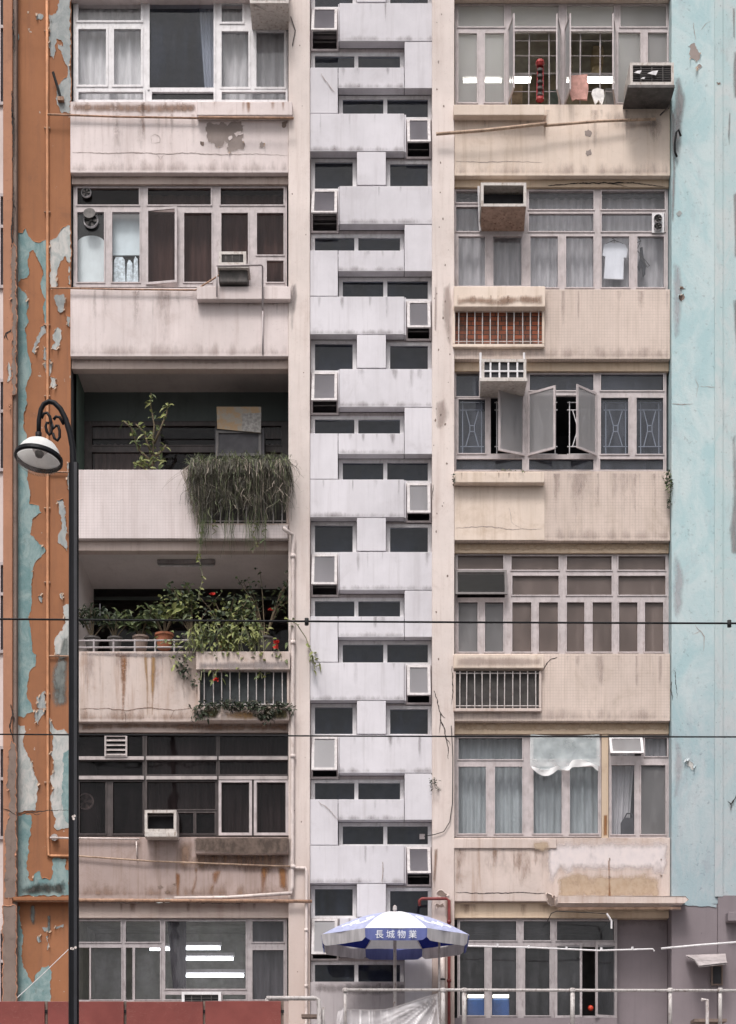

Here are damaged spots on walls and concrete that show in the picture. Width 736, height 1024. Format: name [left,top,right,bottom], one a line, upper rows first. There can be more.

water stain [75,103,194,112]
peeling [200,120,246,154]
peeling [6,224,72,446]
corrosion [116,653,126,700]
corrosion [145,656,155,694]
peeling [1,462,69,1001]